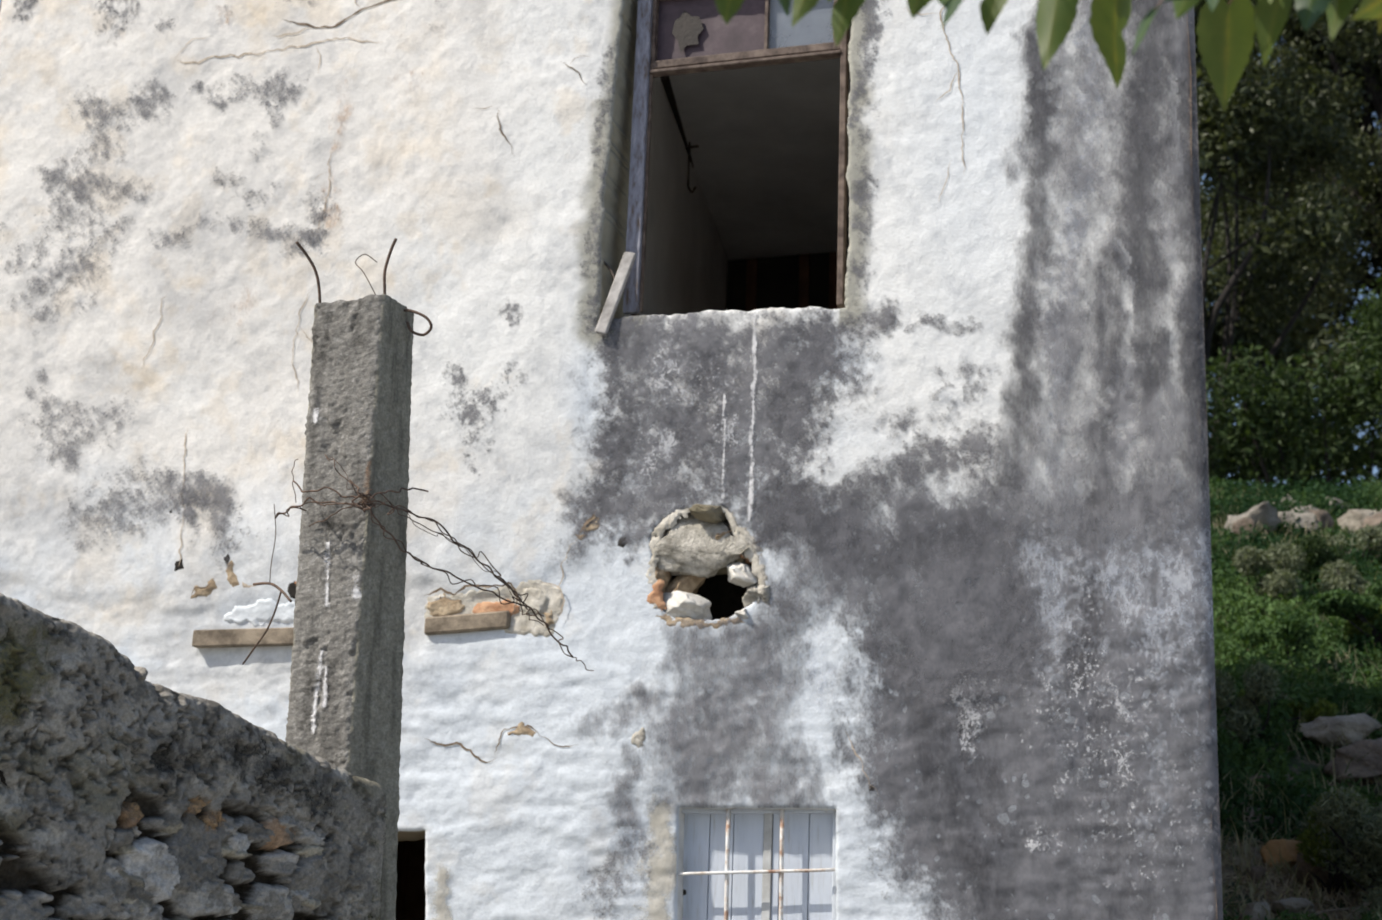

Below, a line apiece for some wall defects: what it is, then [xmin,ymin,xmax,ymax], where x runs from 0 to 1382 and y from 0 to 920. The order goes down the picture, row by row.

crack [177,0,390,72]
leakage [192,74,300,129]
crack [907,7,966,198]
leakage [5,80,172,321]
leakage [155,167,340,255]
leakage [25,369,126,470]
leakage [560,0,1223,920]
leakage [67,458,242,567]
spalling [424,579,565,637]
spalling [646,504,771,629]
crack [428,725,573,763]